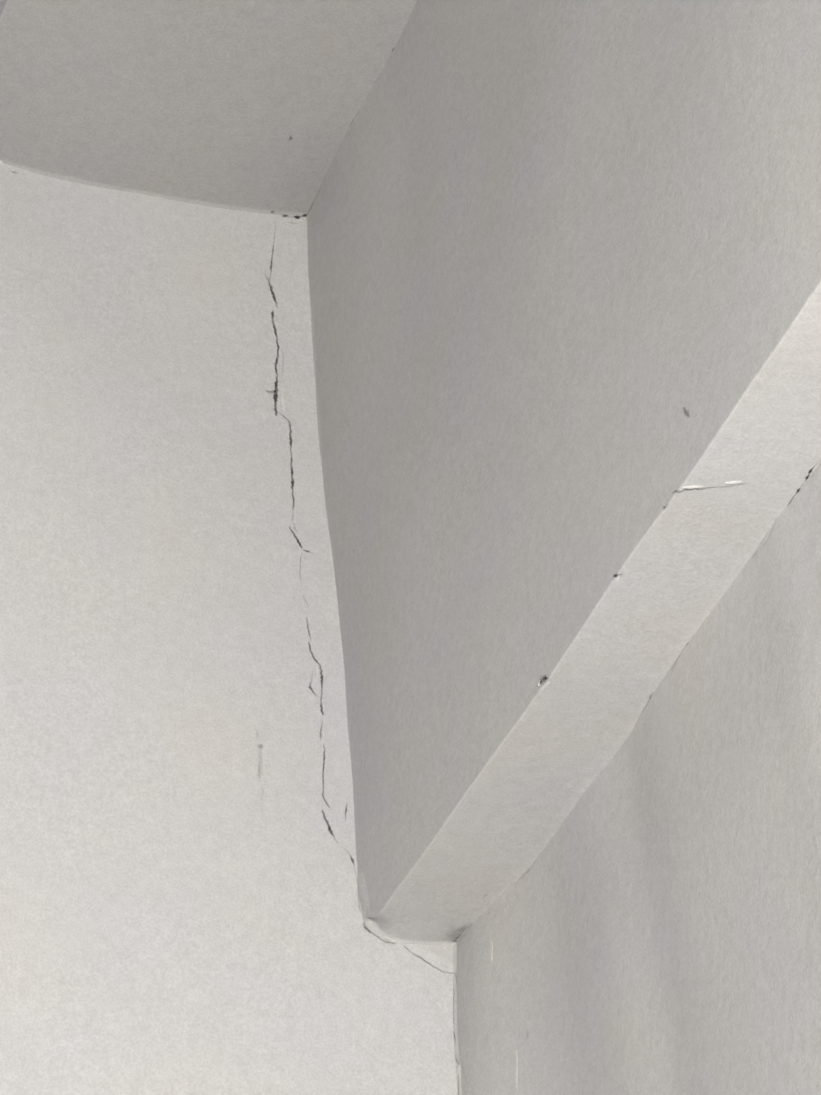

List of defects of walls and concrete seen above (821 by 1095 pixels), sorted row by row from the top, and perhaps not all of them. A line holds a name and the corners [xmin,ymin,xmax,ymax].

crack [270,285,301,547]
crack [309,658,325,740]